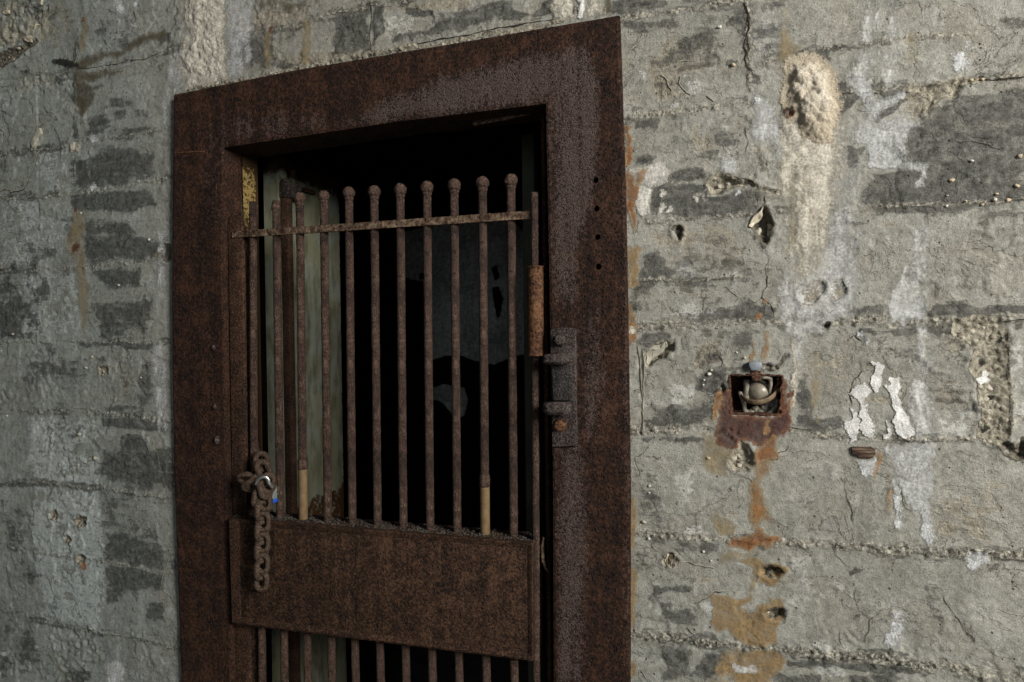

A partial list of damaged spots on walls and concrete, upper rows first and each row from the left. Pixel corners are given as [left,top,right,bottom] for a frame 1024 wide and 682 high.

crack [743,0,754,76]
corrosion [625,125,647,232]
spalling [705,172,782,249]
corrosion [627,246,642,288]
corrosion [628,305,638,343]
spalling [951,314,1024,463]
corrosion [705,380,794,682]